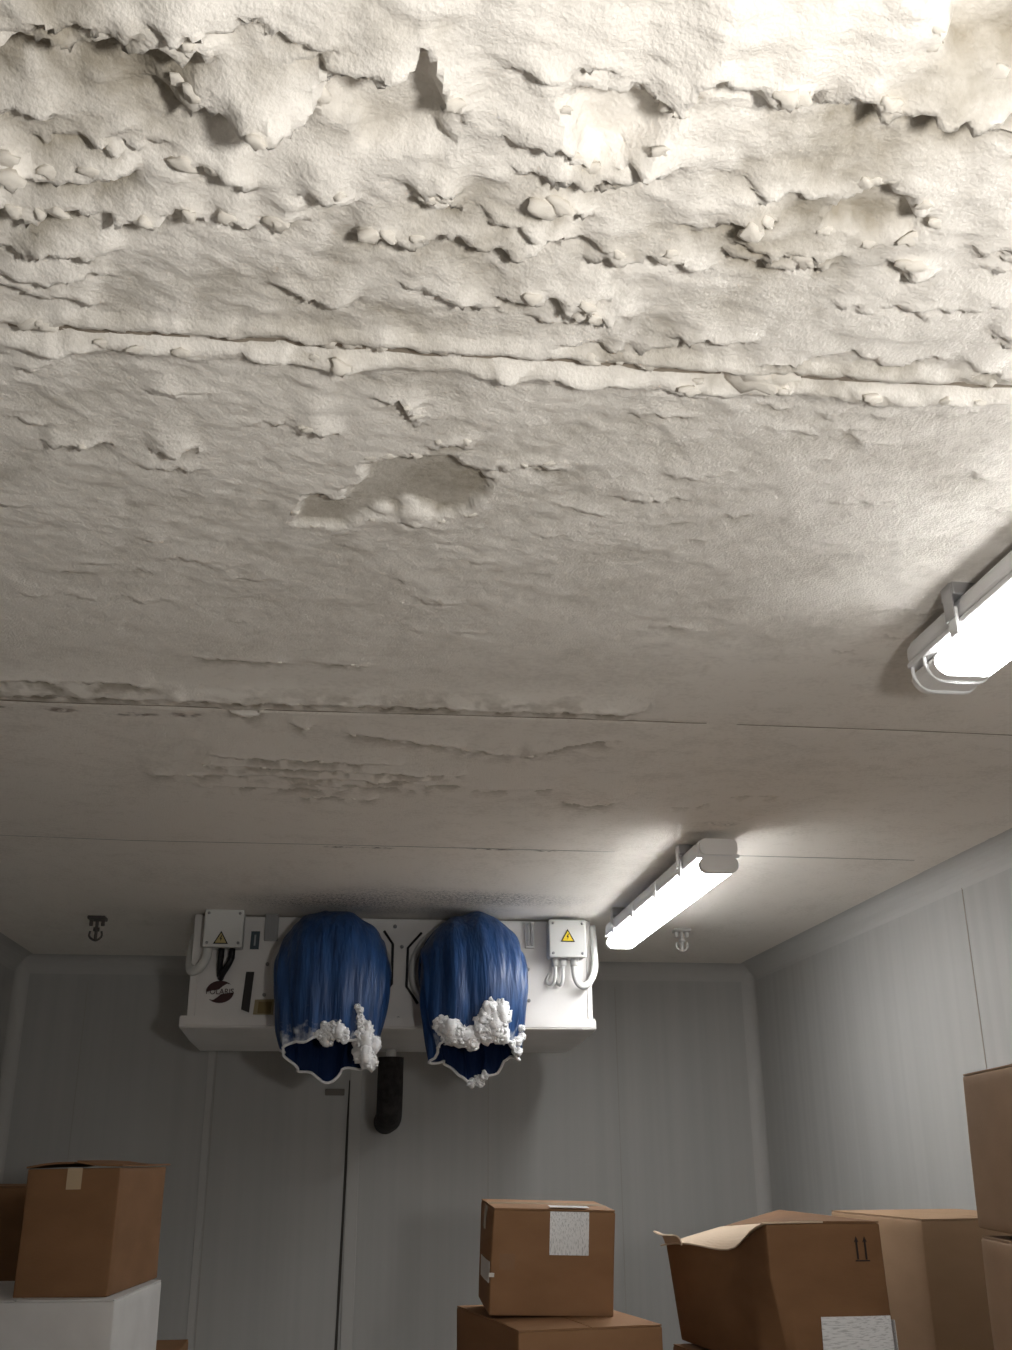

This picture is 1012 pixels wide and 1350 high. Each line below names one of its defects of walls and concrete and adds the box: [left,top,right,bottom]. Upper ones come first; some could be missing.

spalling [918,0,1012,87]
peeling [169,72,200,104]
spalling [312,28,468,159]
spalling [553,79,702,183]
peeling [772,88,813,110]
peeling [0,149,72,222]
peeling [357,228,425,245]
peeling [527,195,576,220]
peeling [737,215,775,244]
spalling [815,176,941,273]
crack [0,310,1012,408]
spalling [286,439,500,531]